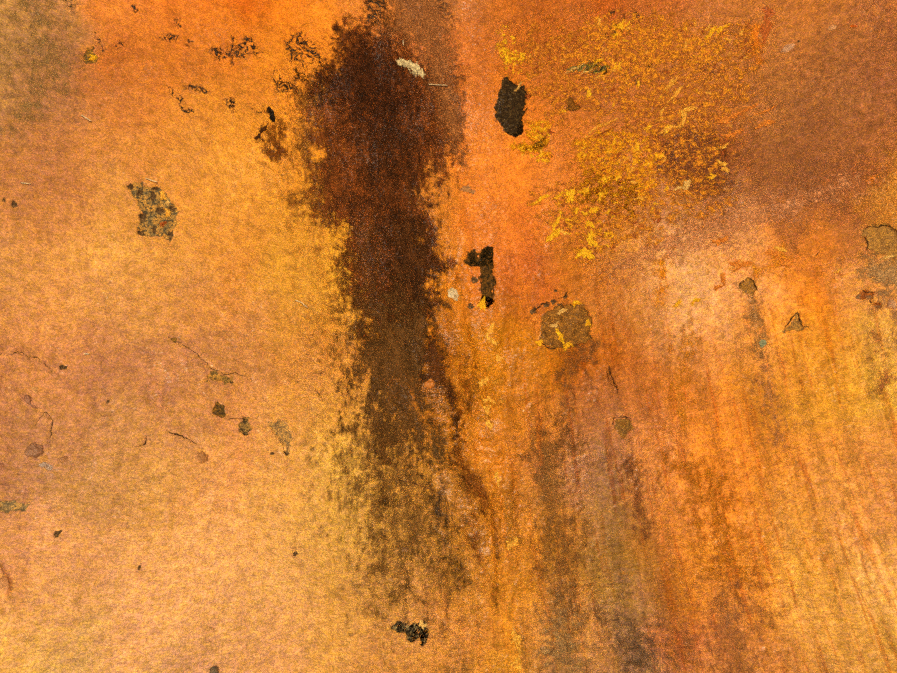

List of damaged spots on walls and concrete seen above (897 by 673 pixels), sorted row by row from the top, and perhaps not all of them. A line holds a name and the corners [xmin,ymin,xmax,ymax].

peeling [494,4,777,288]
spalling [126,182,179,243]
spalling [861,223,897,262]
spalling [464,246,496,312]
spalling [530,289,593,351]
spalling [712,259,758,296]
spalling [856,289,882,308]
peeling [478,377,497,430]
corrosion [421,335,498,586]
spalling [391,619,428,646]